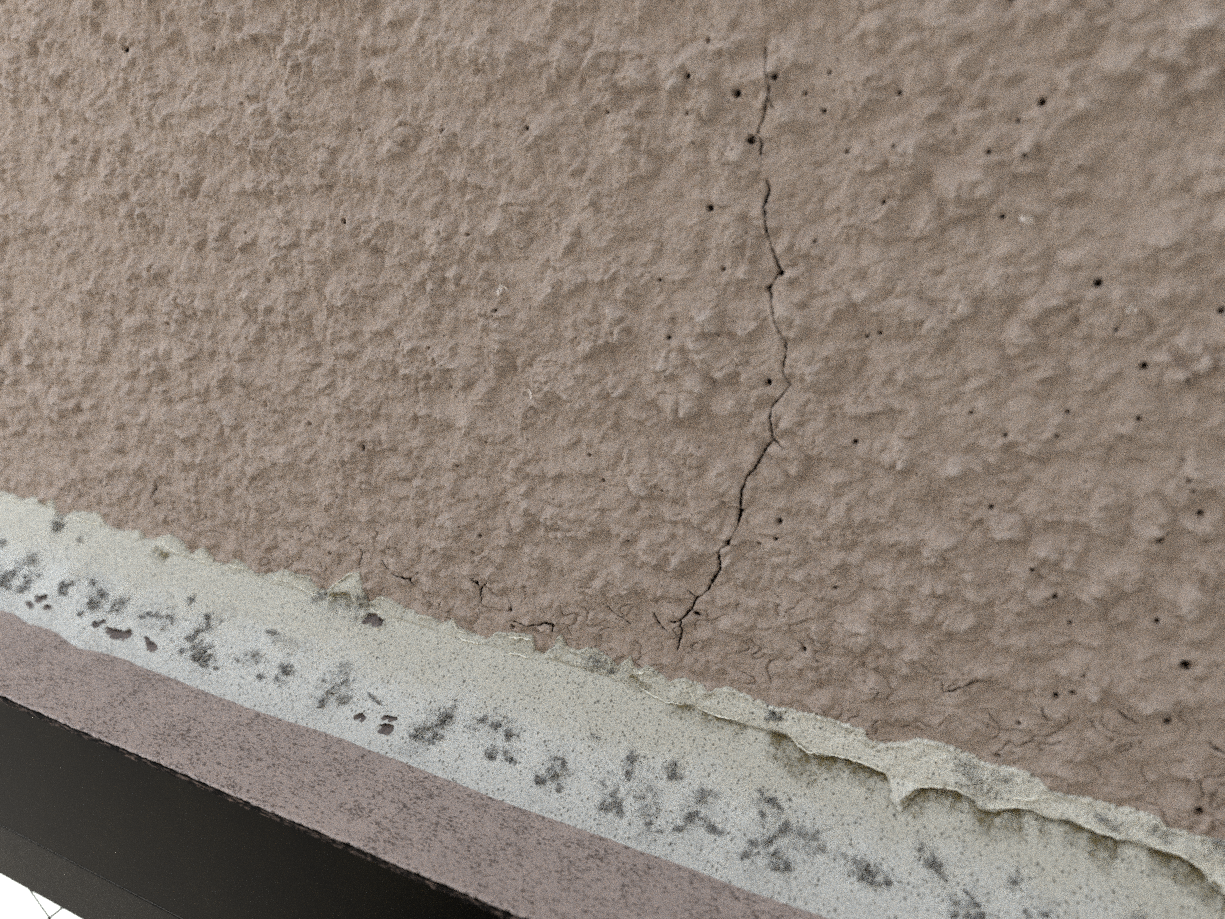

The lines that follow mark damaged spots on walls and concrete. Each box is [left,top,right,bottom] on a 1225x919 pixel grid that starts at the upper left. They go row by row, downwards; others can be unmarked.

crack [608,49,791,650]
peeling [629,657,740,720]
damp [770,730,887,783]
peeling [787,731,890,778]
damp [901,787,1023,833]
peeling [907,786,1048,817]
damp [1064,821,1120,859]
peeling [1077,821,1125,840]
peeling [1148,845,1225,886]
damp [1149,847,1225,912]